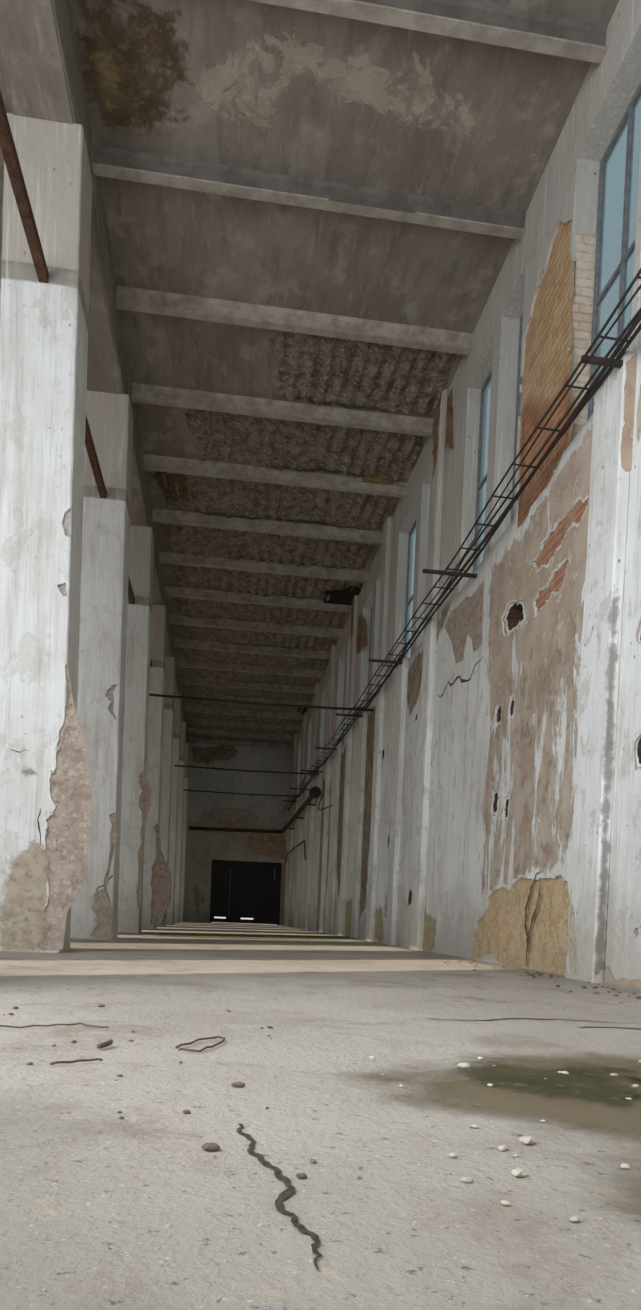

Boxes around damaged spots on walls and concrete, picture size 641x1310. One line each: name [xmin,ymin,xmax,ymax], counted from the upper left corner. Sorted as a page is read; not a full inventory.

water stain [76,0,498,147]
peeling [444,221,601,975]
spalling [106,685,117,720]
spalling [38,665,93,951]
spalling [104,812,117,911]
spalling [136,772,172,925]
crack [429,1018,641,1029]
water stain [369,1056,641,1138]
crack [236,1124,323,1270]